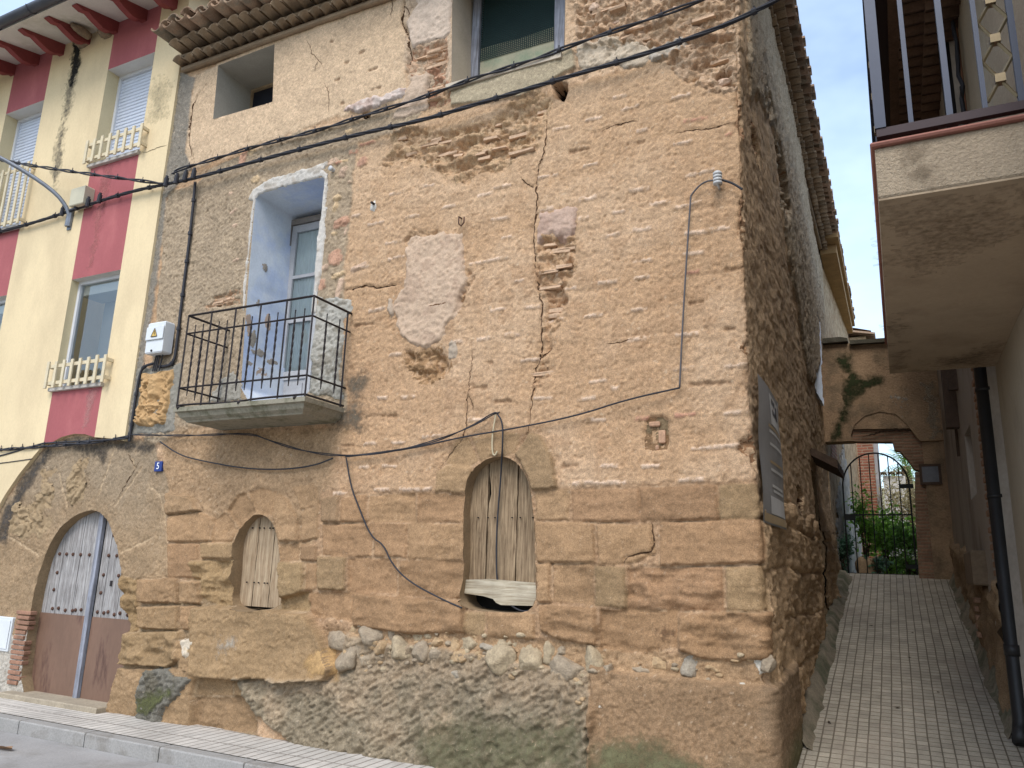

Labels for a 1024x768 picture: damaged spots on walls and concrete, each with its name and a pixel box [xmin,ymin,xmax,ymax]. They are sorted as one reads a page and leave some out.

water stain [53,42,81,181]
crack [148,99,197,155]
crack [390,2,413,65]
spalling [344,0,568,185]
flaking render [387,229,477,385]
crack [521,121,551,431]
spalling [531,206,580,391]
crack [441,344,473,466]
crack [624,524,655,562]